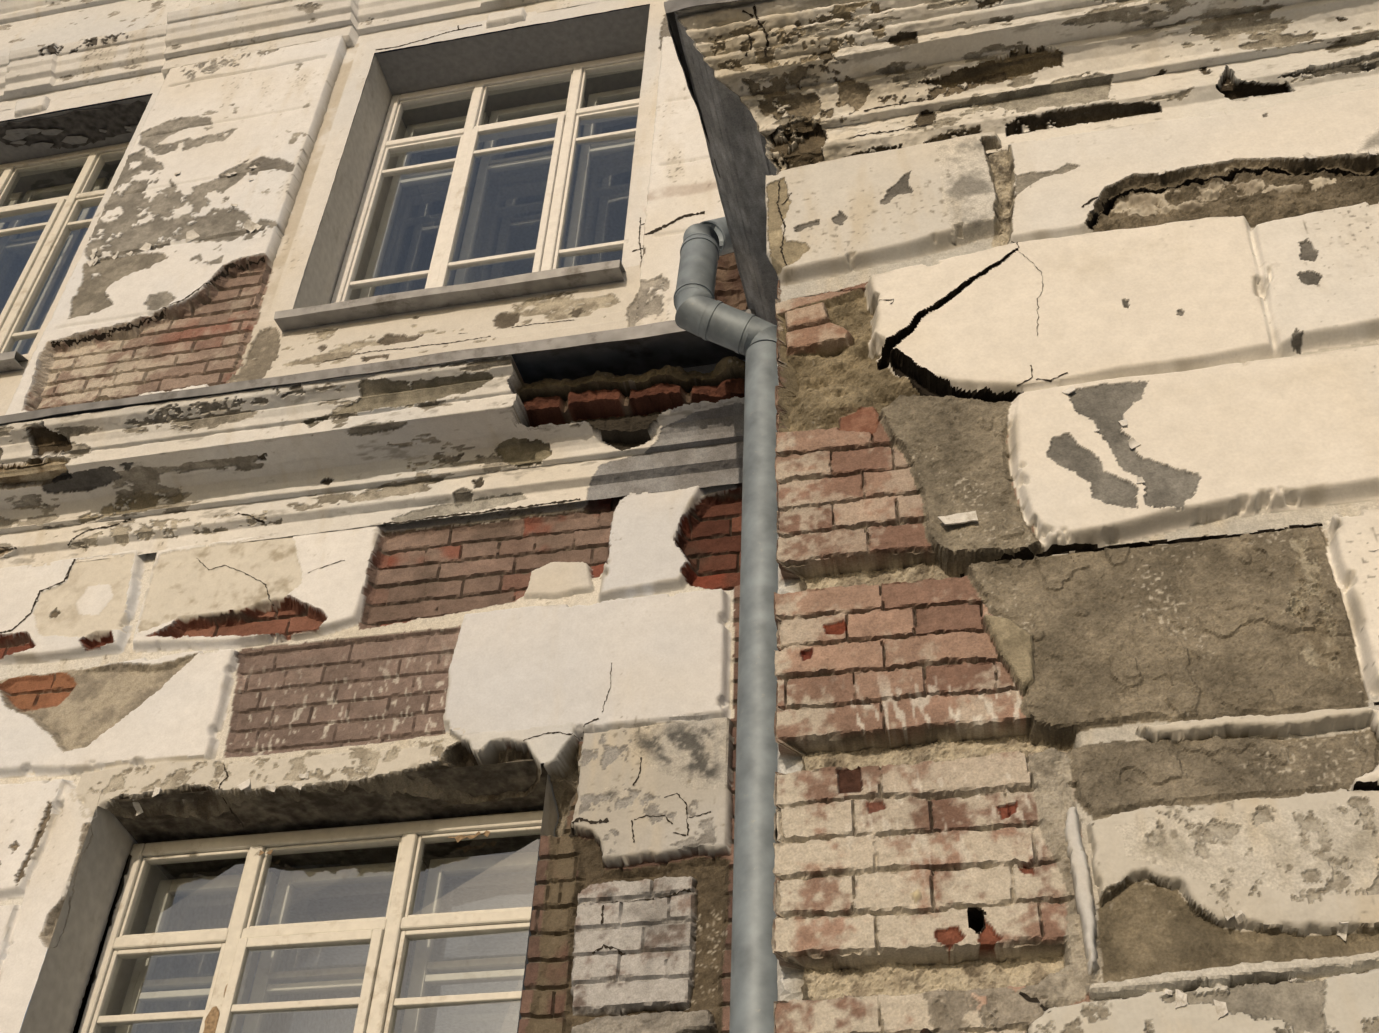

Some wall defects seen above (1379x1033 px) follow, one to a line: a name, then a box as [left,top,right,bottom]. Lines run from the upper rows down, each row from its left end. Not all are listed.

peeling [658,0,671,51]
peeling [707,0,1379,277]
crack [877,241,1068,403]
peeling [1296,237,1324,285]
spalling [0,100,748,1033]
crack [523,663,612,741]
spalling [776,288,1379,1033]
crack [1346,780,1379,791]